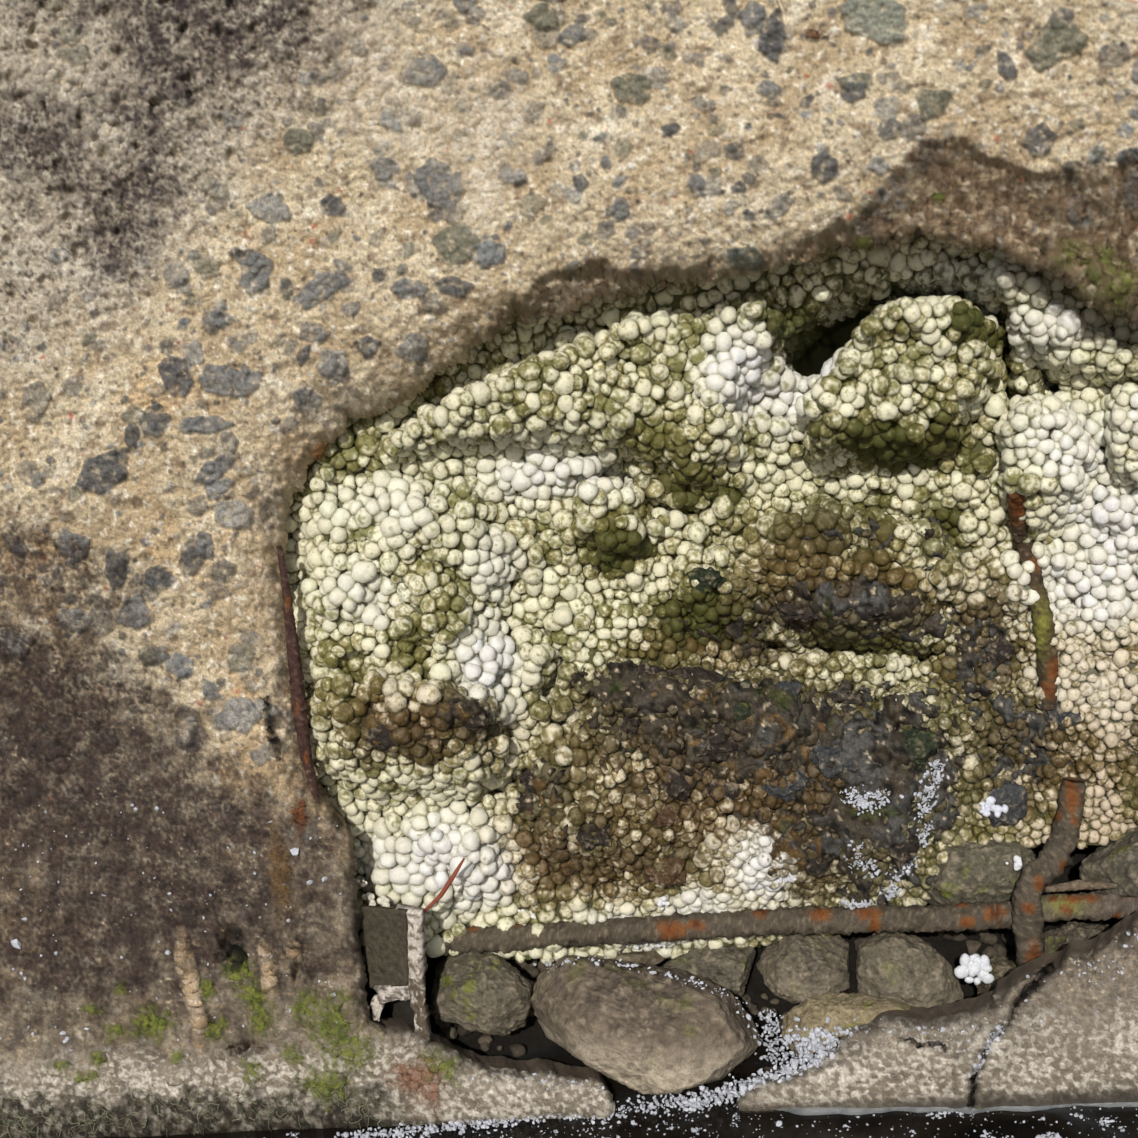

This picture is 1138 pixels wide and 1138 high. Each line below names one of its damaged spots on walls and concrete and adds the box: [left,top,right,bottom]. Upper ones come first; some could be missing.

water stain [0,520,343,1012]
rust [276,545,319,825]
crack [900,1036,945,1050]
crack [967,962,1055,1108]